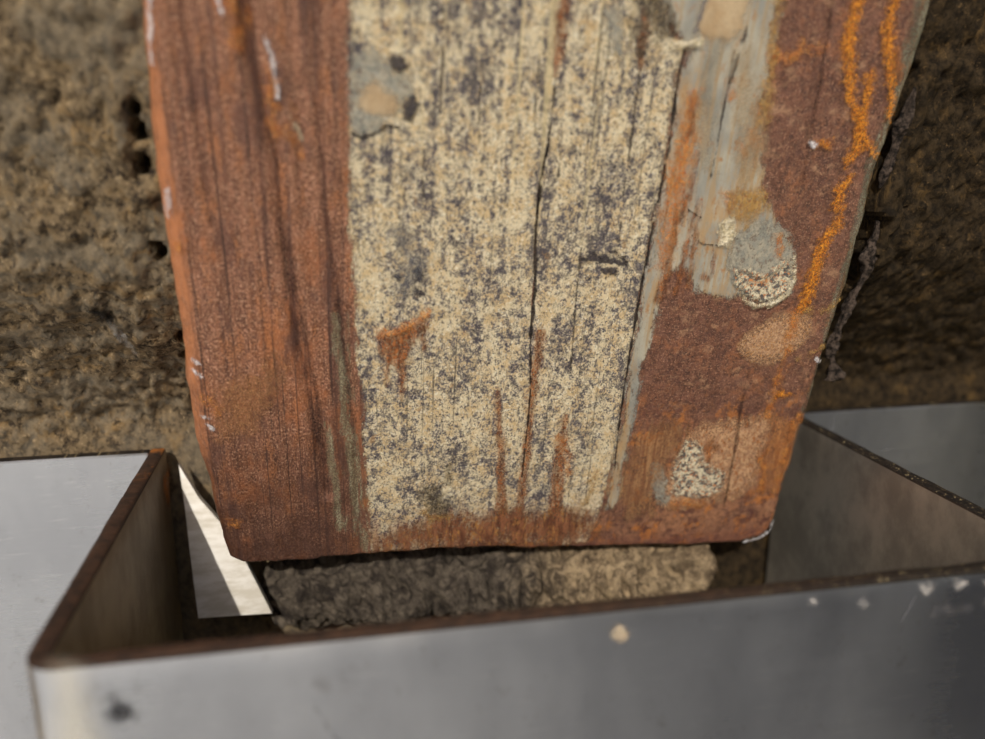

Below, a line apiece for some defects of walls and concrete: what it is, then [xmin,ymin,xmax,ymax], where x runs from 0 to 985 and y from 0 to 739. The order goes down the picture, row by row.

peeling [348,45,418,139]
rust [376,308,431,400]
crack [521,55,561,477]
crack [570,247,582,370]
peeling [717,216,797,309]
rust [738,0,904,496]
rust [370,330,604,552]
peeling [670,440,725,511]